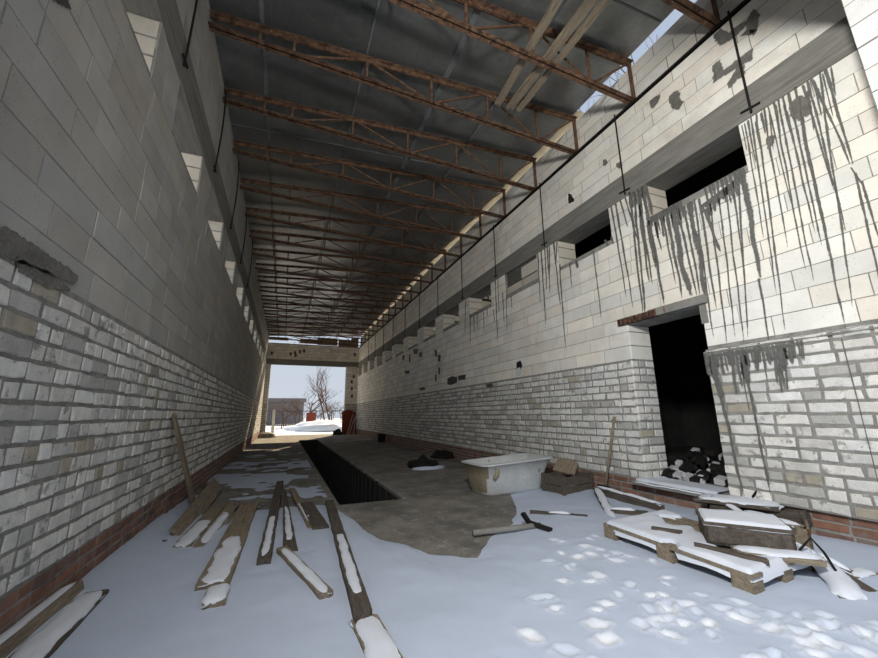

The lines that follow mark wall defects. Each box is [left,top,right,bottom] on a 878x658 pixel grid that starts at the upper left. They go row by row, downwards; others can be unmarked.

leakage [537,240,578,348]
leakage [604,66,878,495]